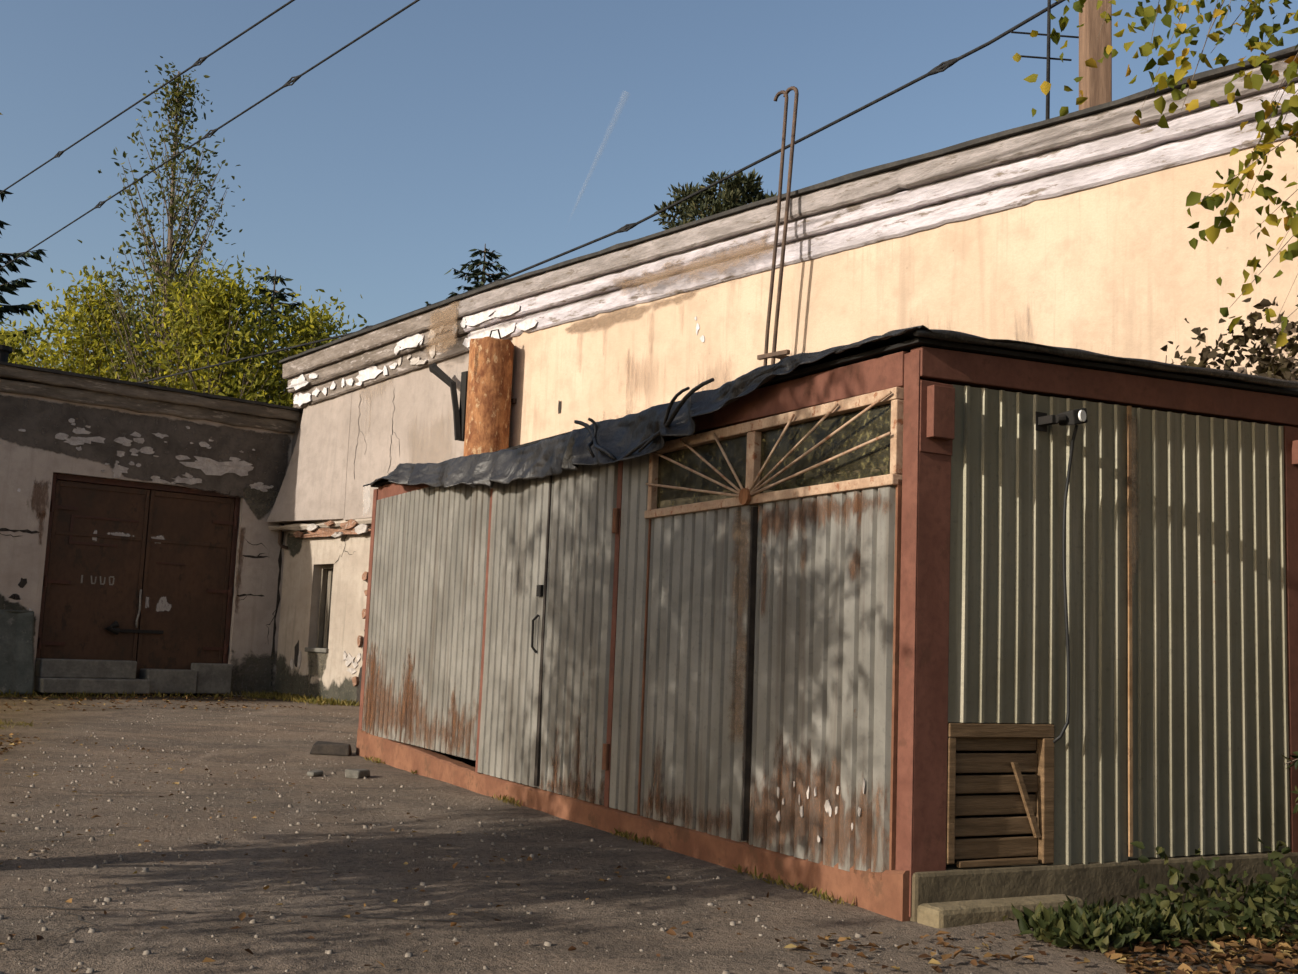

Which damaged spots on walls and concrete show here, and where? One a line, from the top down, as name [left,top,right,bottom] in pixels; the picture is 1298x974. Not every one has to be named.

peeling [286,304,538,407]
peeling [55,418,274,492]
spalling [343,571,368,704]
corrosion [363,645,474,755]
corrosion [751,756,889,880]